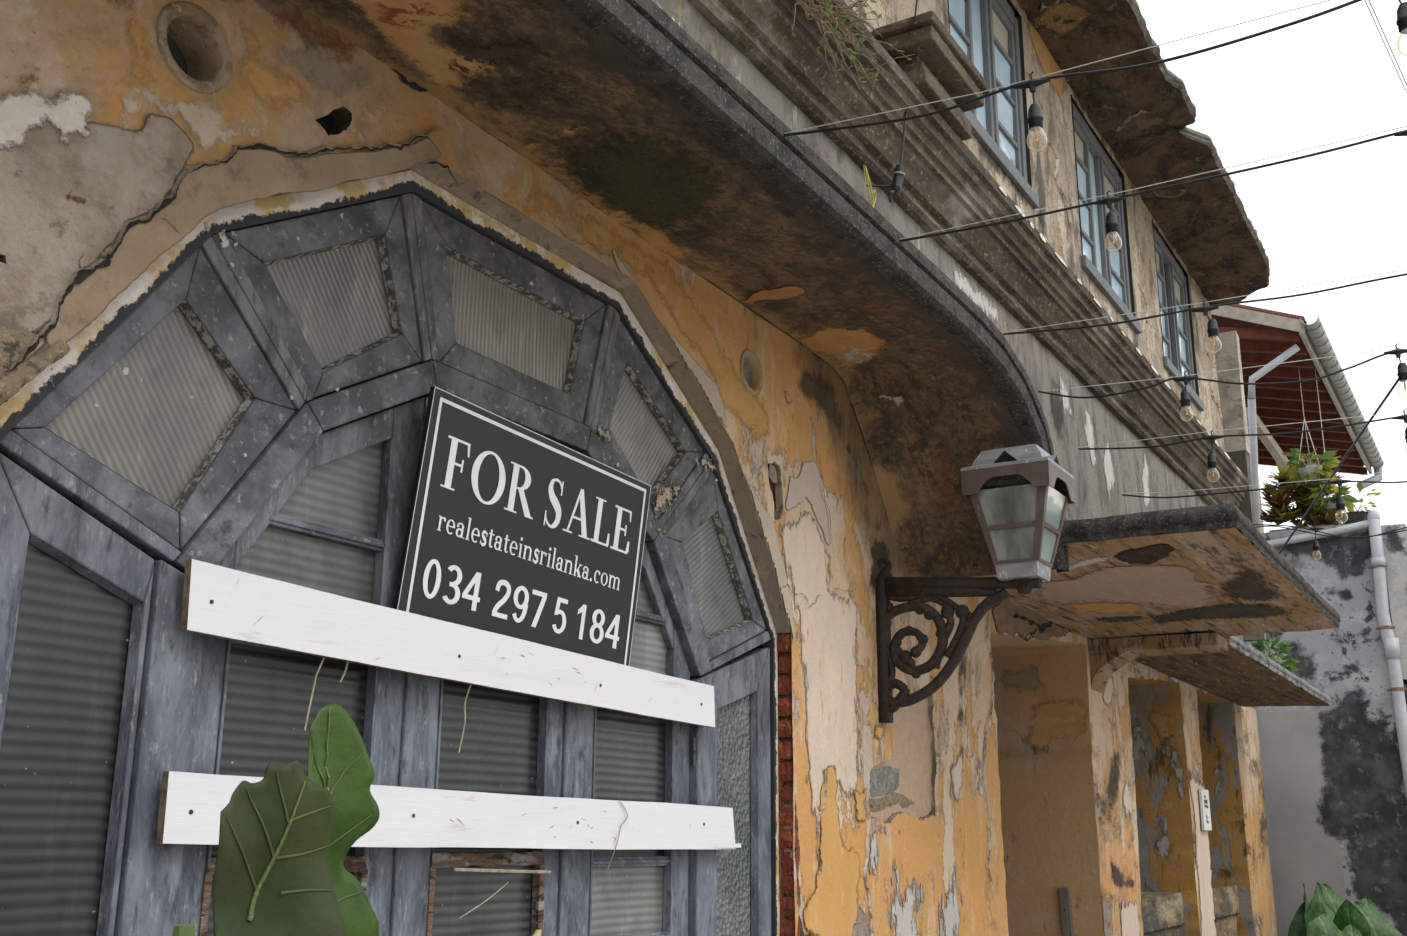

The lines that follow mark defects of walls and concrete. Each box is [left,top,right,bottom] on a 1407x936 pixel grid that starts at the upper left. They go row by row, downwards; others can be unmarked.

crack [391,68,427,92]
damp [449,38,576,116]
flaking render [0,87,441,379]
crack [0,128,457,406]
damp [543,122,795,235]
damp [949,271,998,321]
flaking render [661,322,727,429]
peeling [1034,557,1214,608]
damp [1284,527,1405,599]
peeling [746,461,983,936]
peeling [1131,719,1224,936]
damp [1317,662,1407,936]